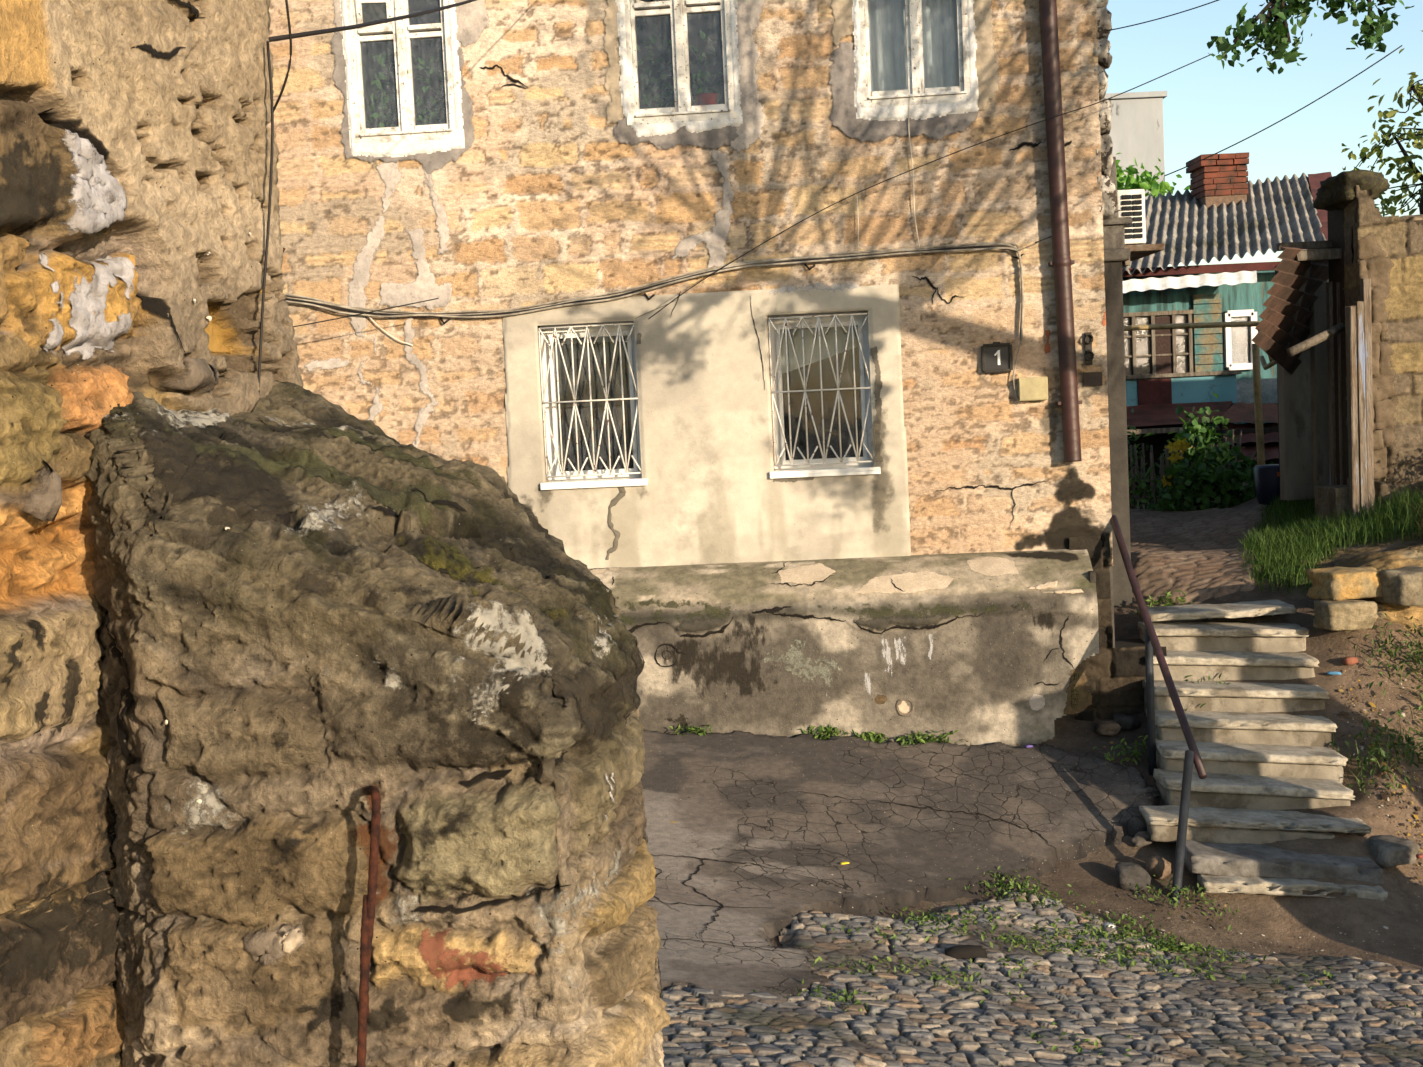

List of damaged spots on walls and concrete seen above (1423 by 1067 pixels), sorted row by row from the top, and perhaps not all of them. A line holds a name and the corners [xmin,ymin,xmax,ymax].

flaking render [62,129,127,235]
peeling [39,254,135,360]
crack [589,486,626,585]
water stain [872,412,889,529]
water stain [1007,468,1113,566]
water stain [663,615,841,697]
crack [628,562,985,667]
water stain [1033,613,1054,630]
crack [1034,616,1074,686]
corrosion [351,785,399,907]
crack [798,791,1058,859]
crack [648,854,805,955]